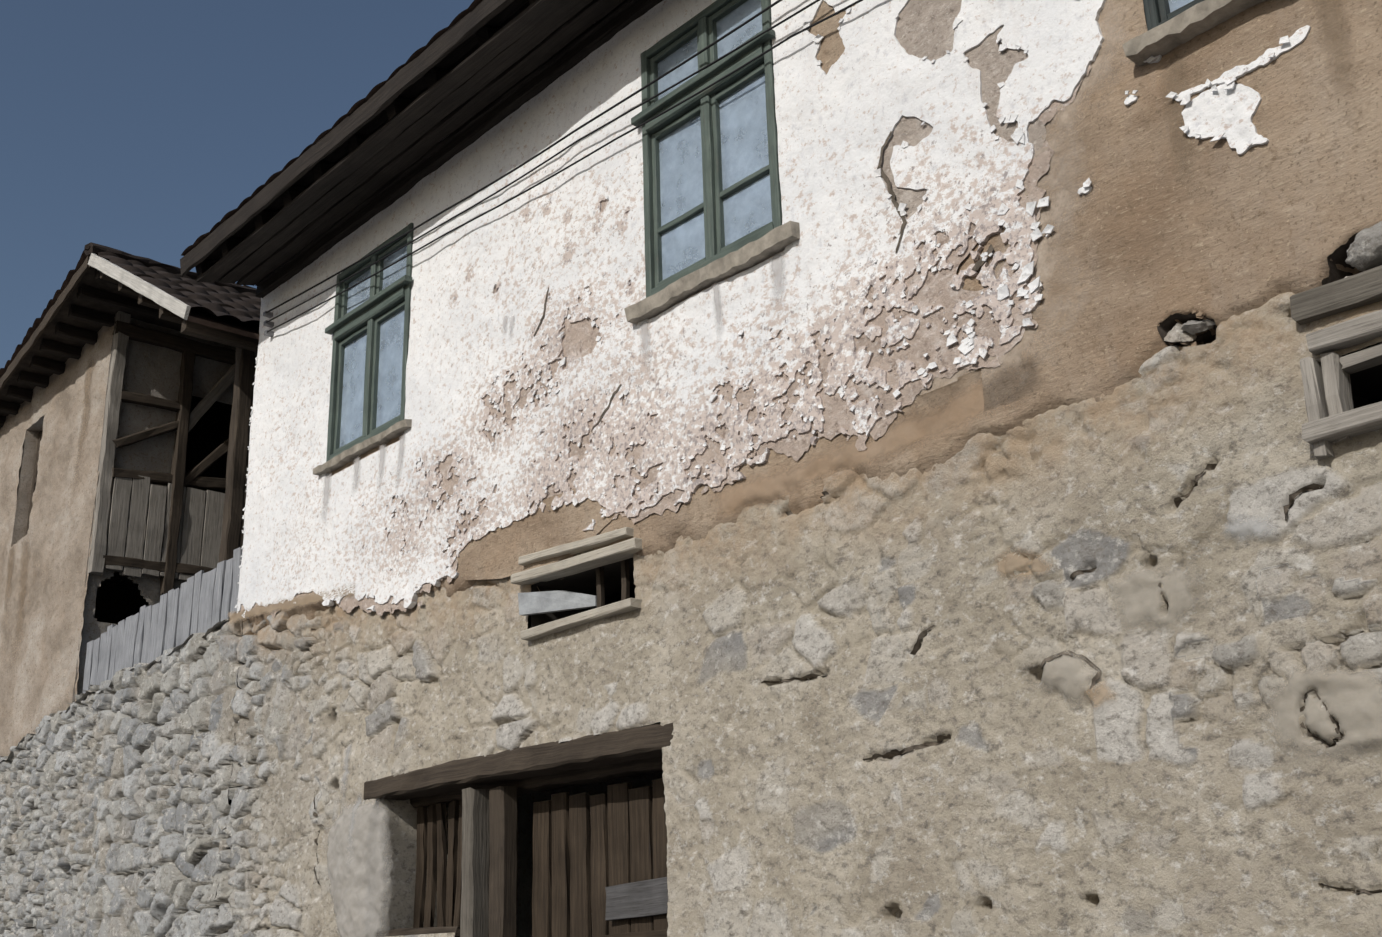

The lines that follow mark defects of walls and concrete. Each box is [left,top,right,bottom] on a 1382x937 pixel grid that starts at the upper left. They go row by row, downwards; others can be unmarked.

crack [877,131,907,253]
spalling [1321,221,1382,285]
peeling [338,0,1118,616]
spalling [1157,309,1217,346]
crack [1174,464,1217,508]
crack [1283,483,1324,521]
peeling [235,468,280,618]
crack [910,625,935,655]
crack [761,671,829,684]
crack [1300,689,1343,748]
crack [863,734,951,761]